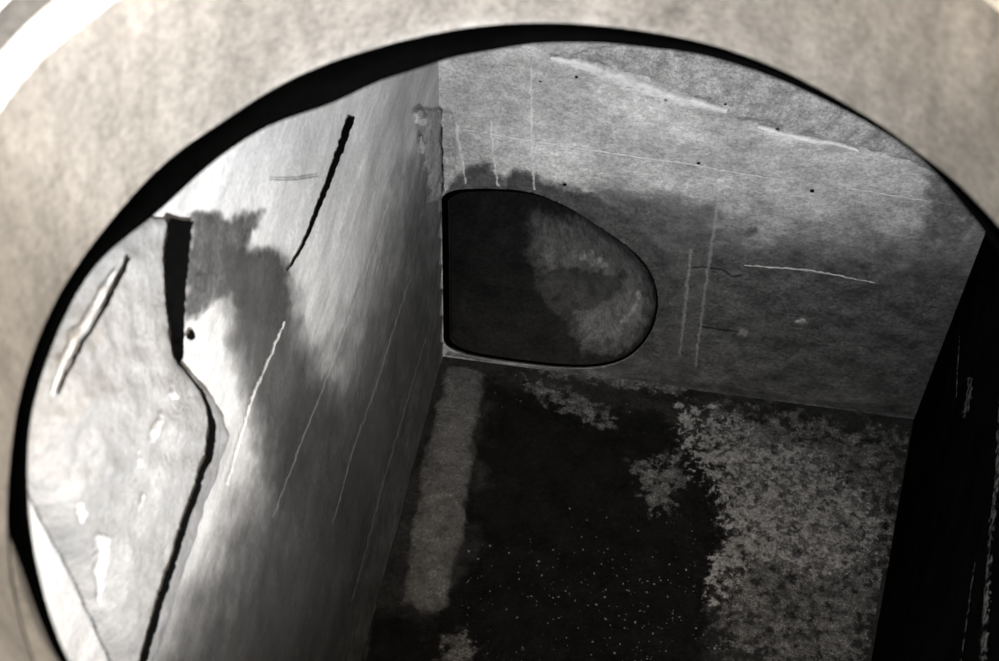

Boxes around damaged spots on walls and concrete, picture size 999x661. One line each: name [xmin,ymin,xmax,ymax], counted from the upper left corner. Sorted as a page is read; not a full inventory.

crack [269,116,355,271]
flaking render [52,271,117,394]
flaking render [151,415,164,440]
damp [166,164,975,661]
flaking render [78,503,89,524]
flaking render [95,535,111,602]